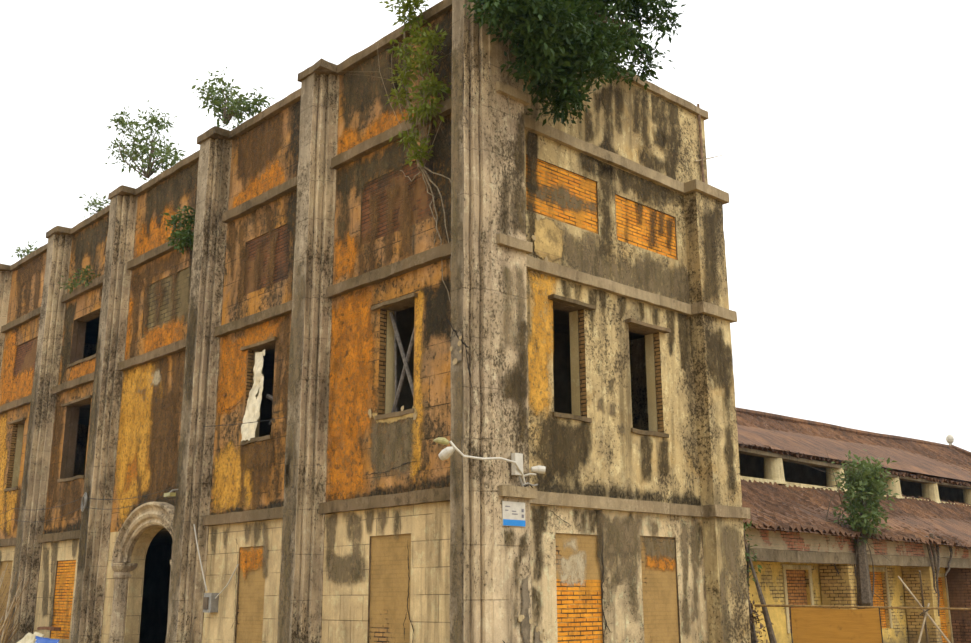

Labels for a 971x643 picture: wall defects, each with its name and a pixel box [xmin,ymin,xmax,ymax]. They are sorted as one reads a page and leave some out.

damp [422,11,462,344]
damp [503,86,693,368]
damp [704,209,720,301]
damp [598,379,615,415]
damp [705,329,737,492]
damp [326,373,462,643]
spalling [518,577,545,643]